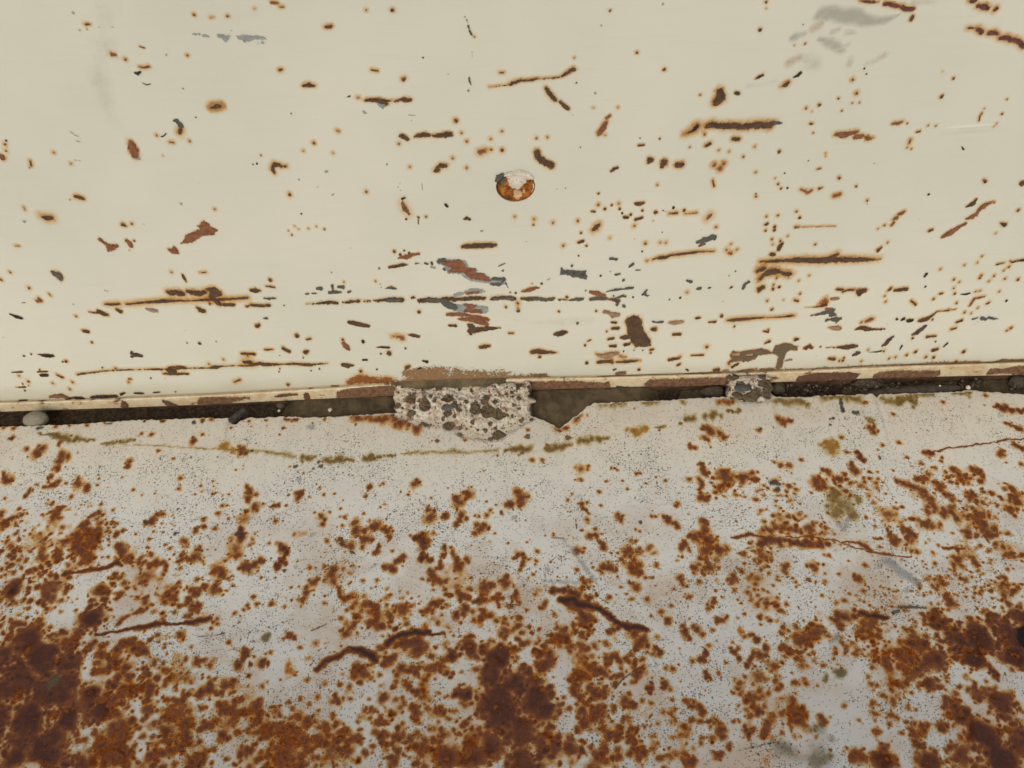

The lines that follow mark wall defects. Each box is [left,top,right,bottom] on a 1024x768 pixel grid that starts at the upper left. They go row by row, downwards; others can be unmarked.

rust [347,375,393,384]
peeling [305,198,999,392]
rust [0,394,1024,768]